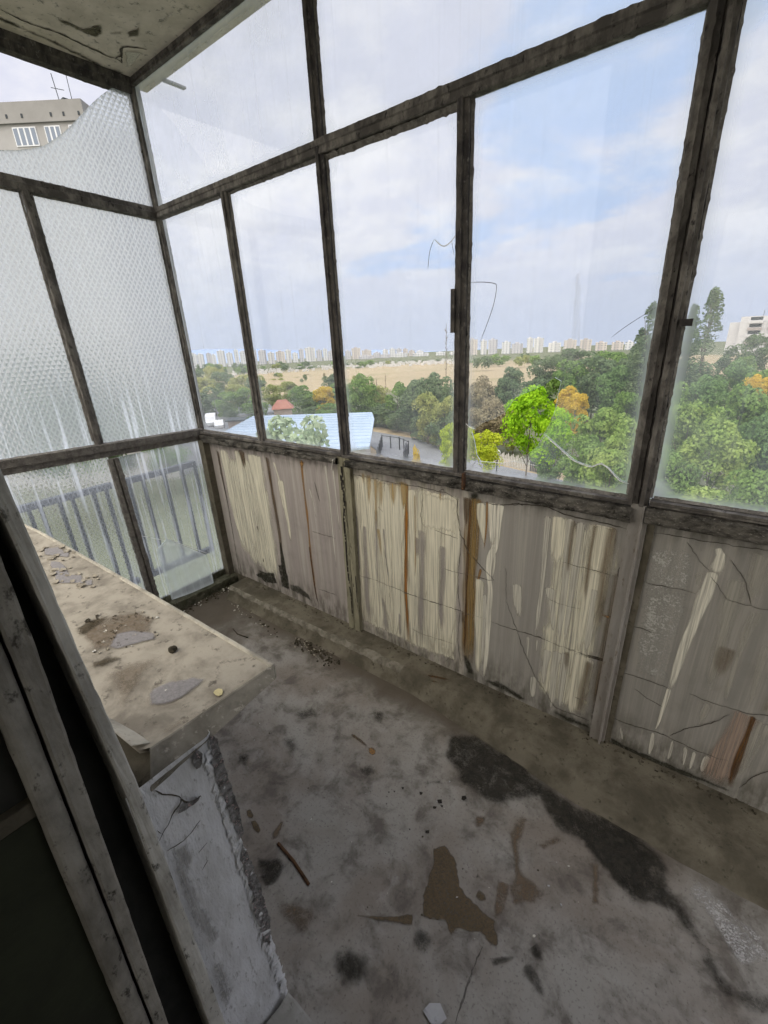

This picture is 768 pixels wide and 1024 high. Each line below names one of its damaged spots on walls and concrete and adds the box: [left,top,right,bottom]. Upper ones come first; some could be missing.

peeling [340,466,358,621]
rust [362,474,416,636]
rust [462,494,488,674]
crack [353,474,598,721]
crack [485,502,625,529]
crack [644,533,767,610]
spalling [178,735,287,997]
water stain [447,736,698,938]
water stain [612,739,724,789]
rust [706,712,756,783]